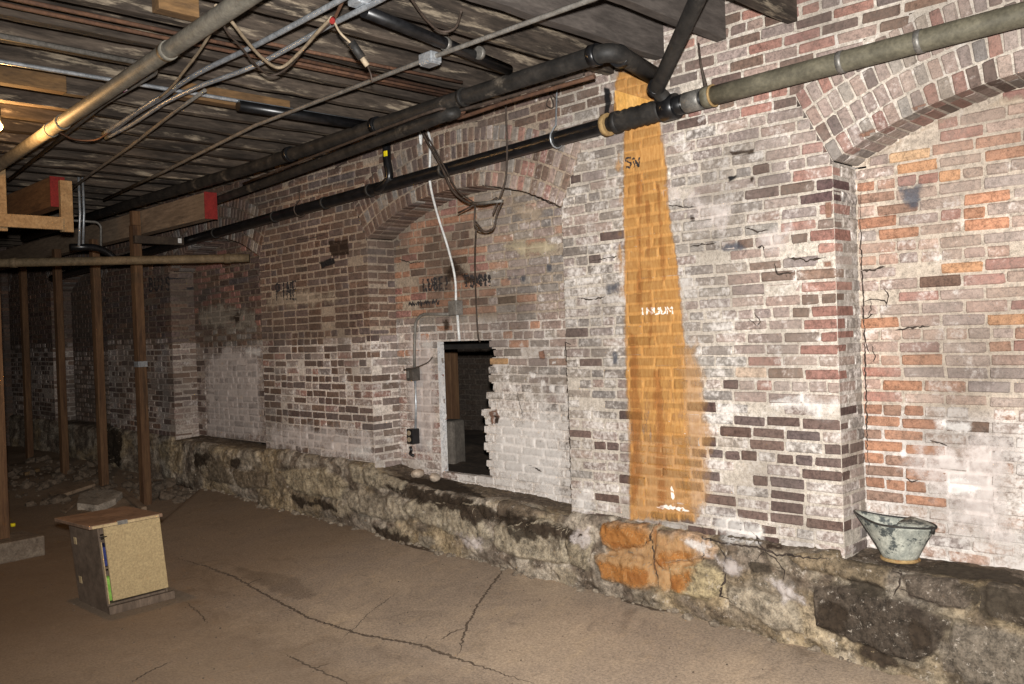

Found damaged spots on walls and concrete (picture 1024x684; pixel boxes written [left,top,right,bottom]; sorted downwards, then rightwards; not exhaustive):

crack [859,195,889,477]
spalling [485,410,500,424]
crack [643,522,660,587]
crack [701,527,832,604]
crack [176,557,534,684]